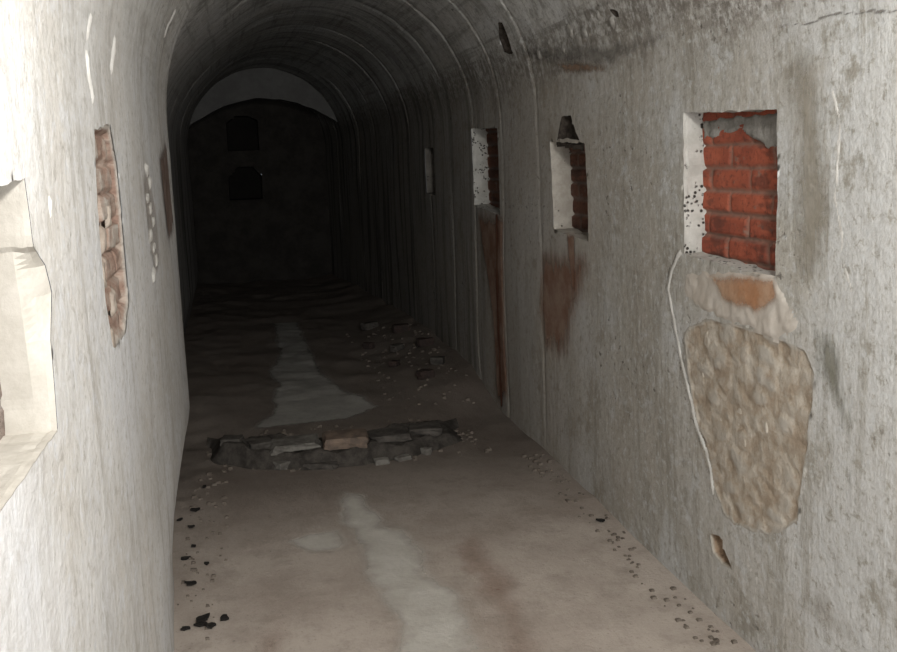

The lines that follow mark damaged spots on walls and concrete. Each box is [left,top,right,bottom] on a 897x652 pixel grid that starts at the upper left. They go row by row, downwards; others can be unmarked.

crack [805,9,897,25]
spalling [94,124,129,348]
corrosion [541,236,582,349]
peeling [684,319,814,535]